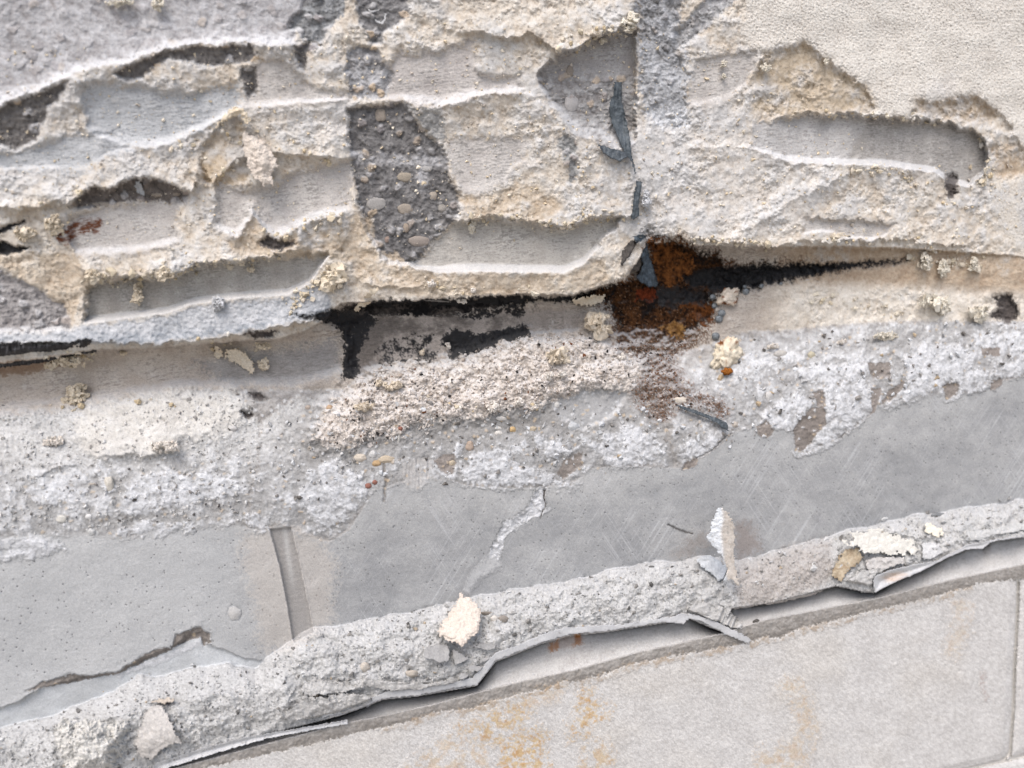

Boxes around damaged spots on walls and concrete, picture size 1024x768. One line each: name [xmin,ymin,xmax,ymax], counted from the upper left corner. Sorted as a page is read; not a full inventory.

spalling [0,0,1024,335]
crack [461,486,552,597]
spalling [0,319,1024,562]
rust [576,223,912,430]